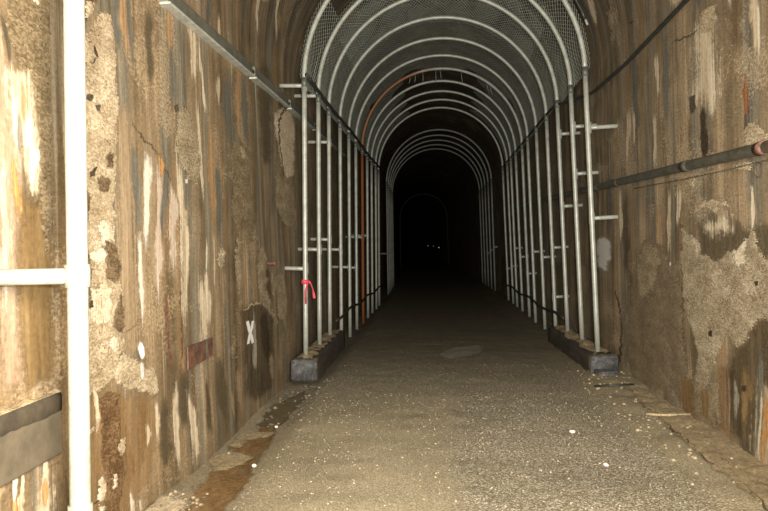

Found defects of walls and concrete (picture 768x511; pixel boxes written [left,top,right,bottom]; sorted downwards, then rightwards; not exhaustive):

spalling [5,0,53,257]
spalling [85,0,125,395]
leakage [145,375,201,463]
leakage [206,361,242,429]
peeling [234,237,243,295]
spalling [243,246,288,401]
spalling [680,227,768,385]